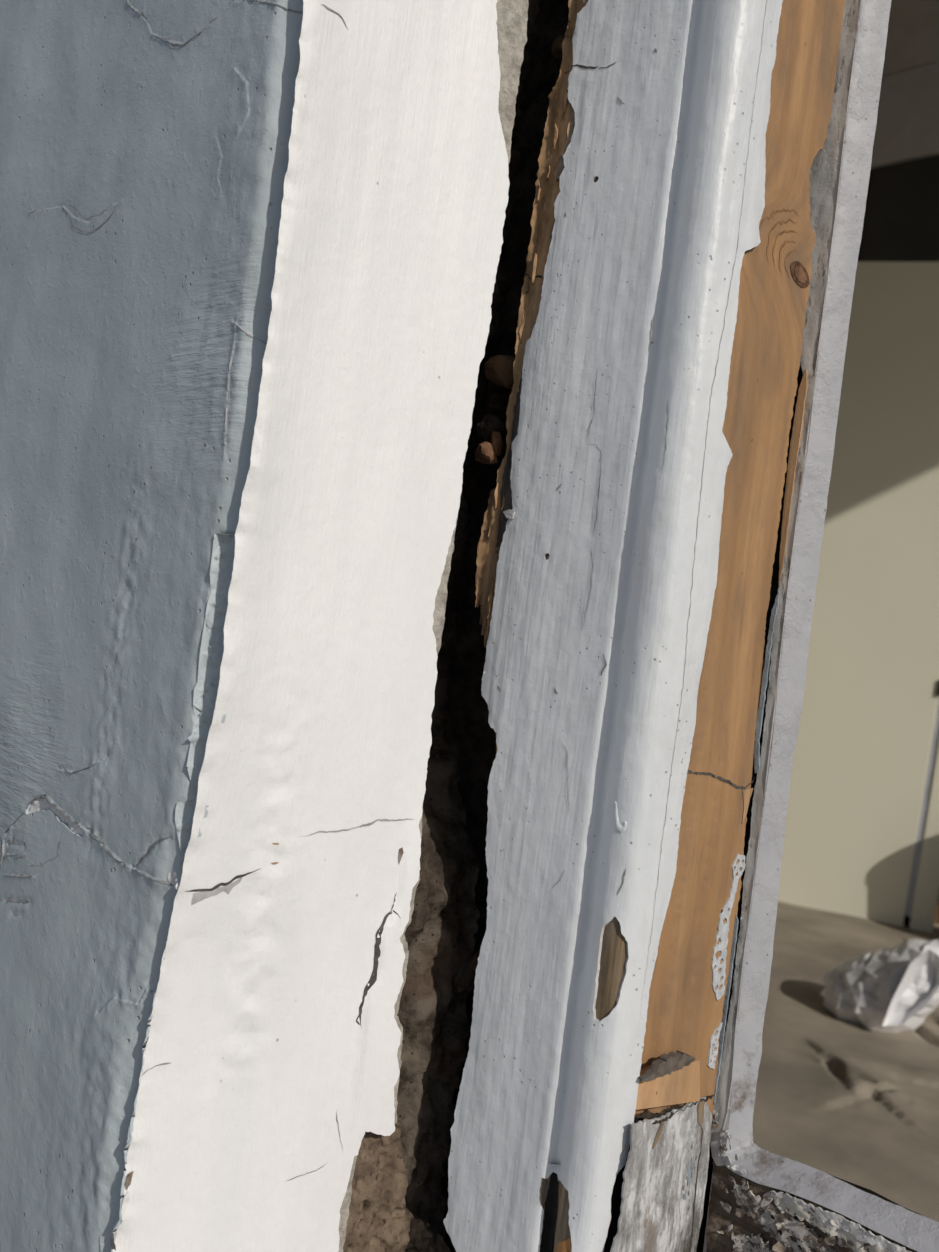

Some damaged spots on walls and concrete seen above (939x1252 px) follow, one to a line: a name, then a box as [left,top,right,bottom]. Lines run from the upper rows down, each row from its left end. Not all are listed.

crack [126,0,348,46]
flaking render [496,0,529,165]
peeling [556,102,575,182]
crack [30,202,117,233]
crack [639,3,767,1021]
flaking render [432,516,458,655]
crack [0,762,262,892]
crack [300,818,414,837]
crack [356,894,400,1029]
peeling [595,917,627,1020]
flaking render [338,876,451,1252]
peeling [698,854,912,1252]